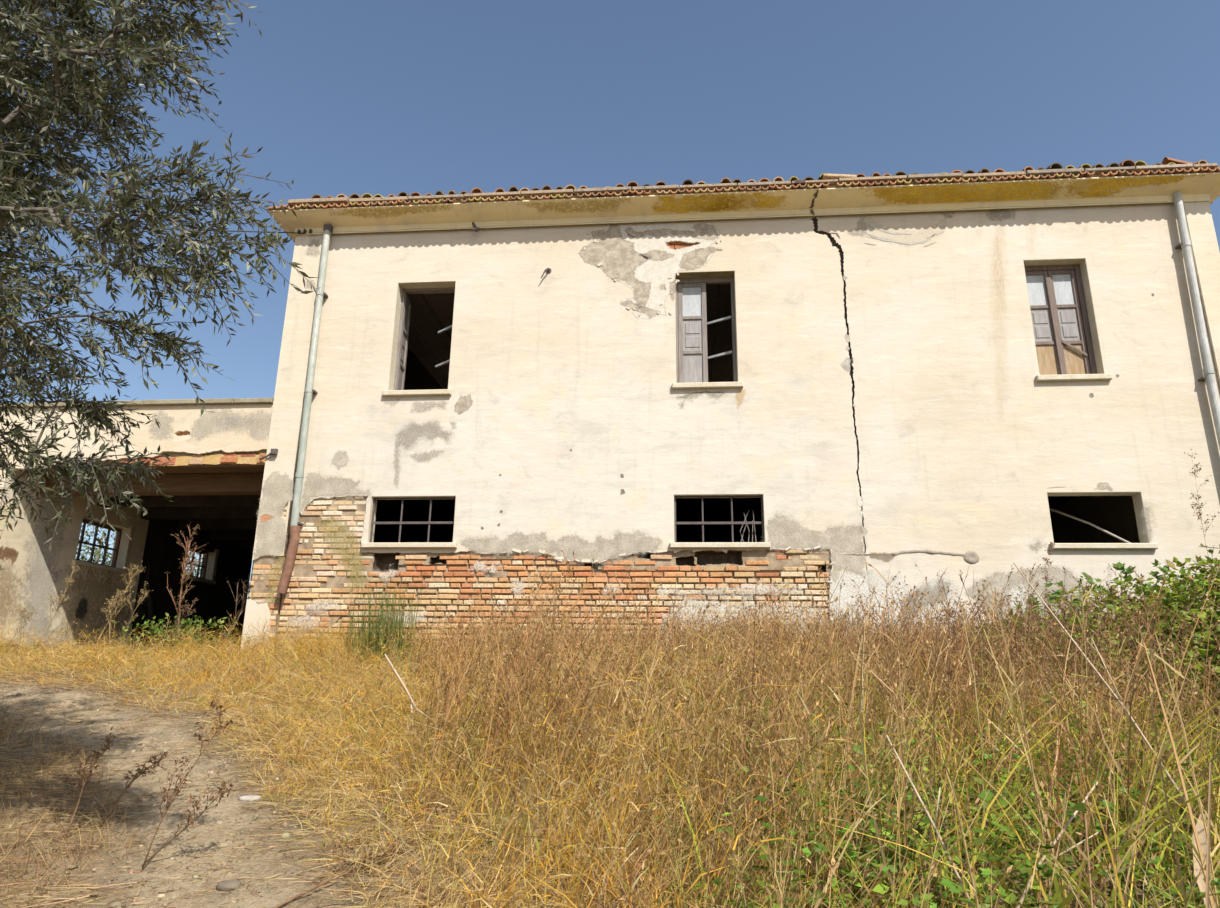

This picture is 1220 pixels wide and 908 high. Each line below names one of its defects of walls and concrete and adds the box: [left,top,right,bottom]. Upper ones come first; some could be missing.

flaking render [579,221,723,319]
flaking render [150,409,271,440]
flaking render [454,395,473,414]
crack [809,190,871,603]
flaking render [249,472,968,650]